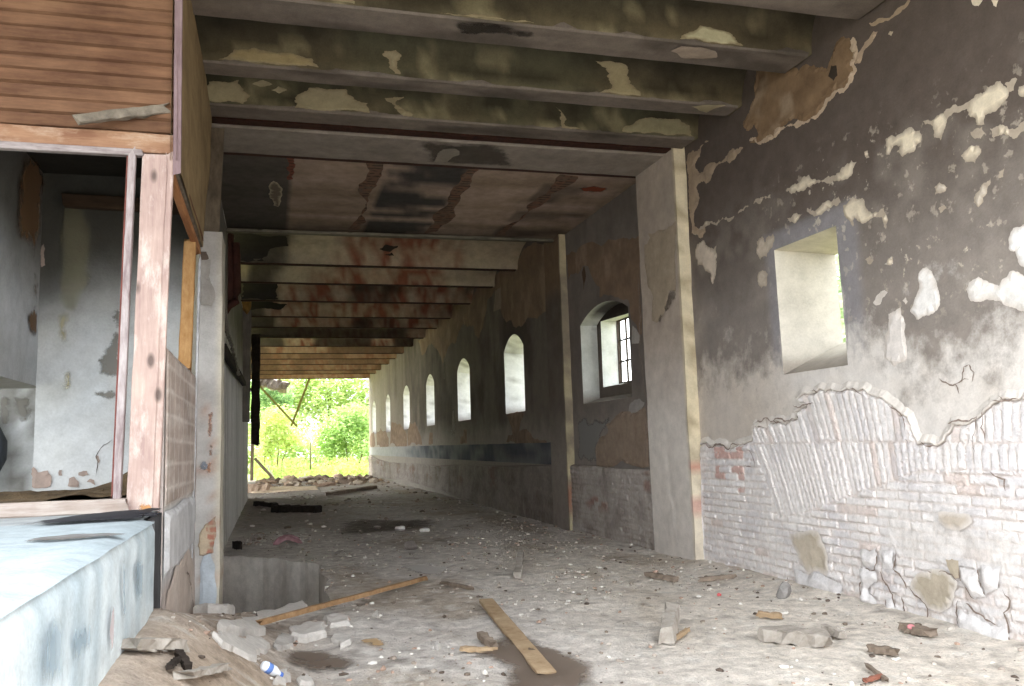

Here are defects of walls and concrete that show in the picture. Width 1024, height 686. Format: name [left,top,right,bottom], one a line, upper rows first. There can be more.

flaking render [207,80,370,113]
flaking render [596,61,641,96]
flaking render [622,0,910,288]
peeling [886,78,1024,163]
peeling [974,169,1004,207]
peeling [966,225,1024,311]
peeling [884,267,940,367]
crack [941,364,974,393]
flaking render [31,467,95,488]
flaking render [570,399,655,550]
flaking render [700,381,1024,642]
spalling [165,516,335,614]